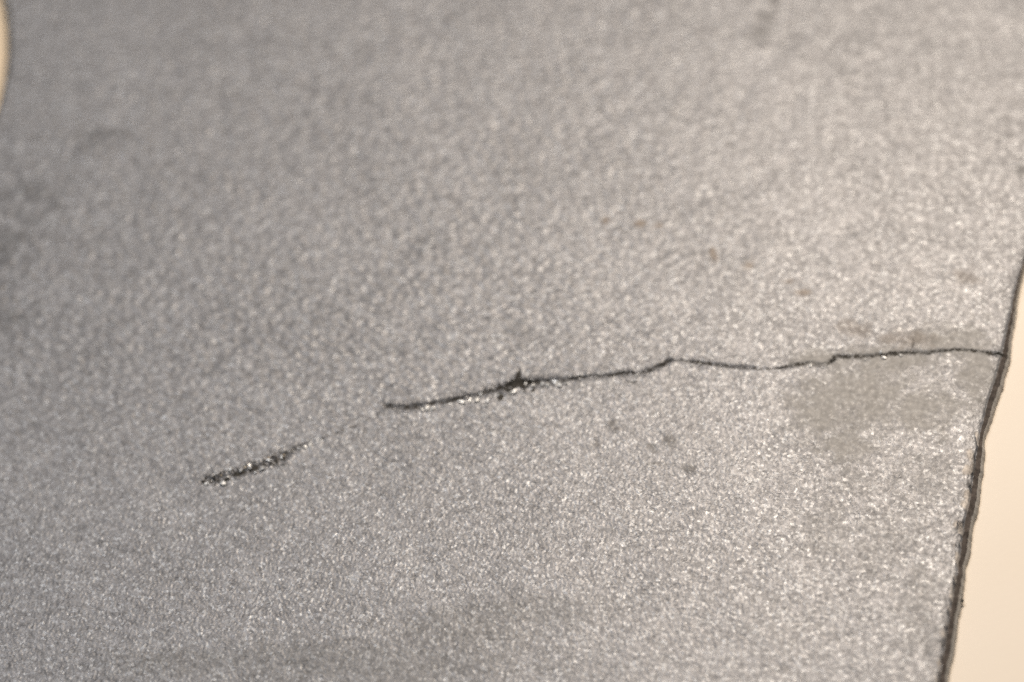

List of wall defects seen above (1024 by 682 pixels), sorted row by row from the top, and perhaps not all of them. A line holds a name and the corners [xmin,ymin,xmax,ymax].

crack [202,340,1004,486]